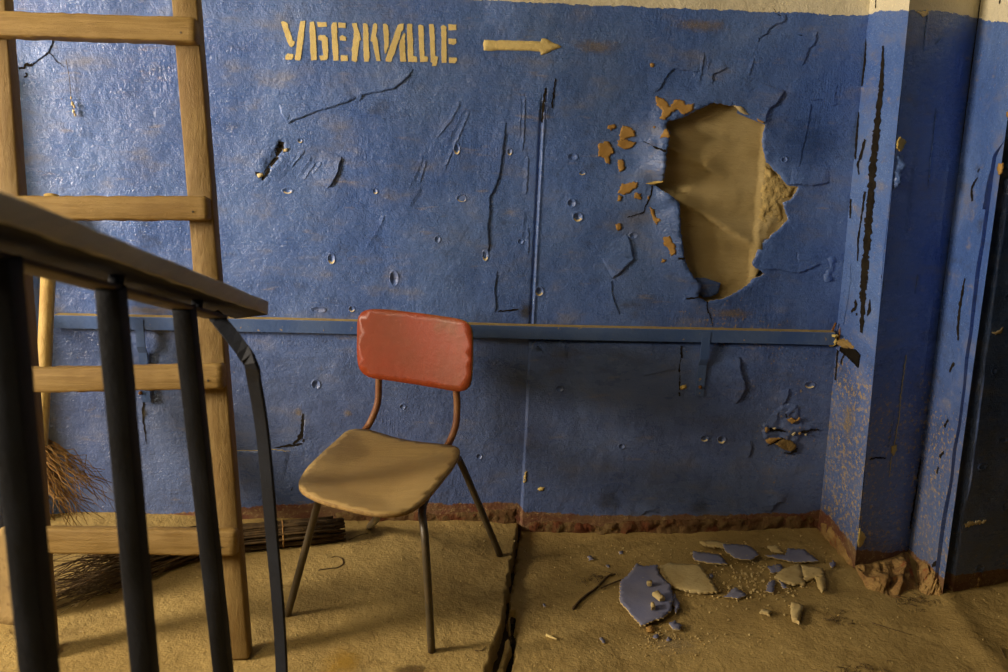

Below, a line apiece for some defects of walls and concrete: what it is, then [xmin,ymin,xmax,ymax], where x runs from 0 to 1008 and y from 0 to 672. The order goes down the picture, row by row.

crack [541,78,556,122]
peeling [598,82,822,317]
crack [851,299,871,316]
spalling [762,388,820,454]
spalling [335,509,517,524]
spalling [528,515,949,598]
crack [493,536,520,672]